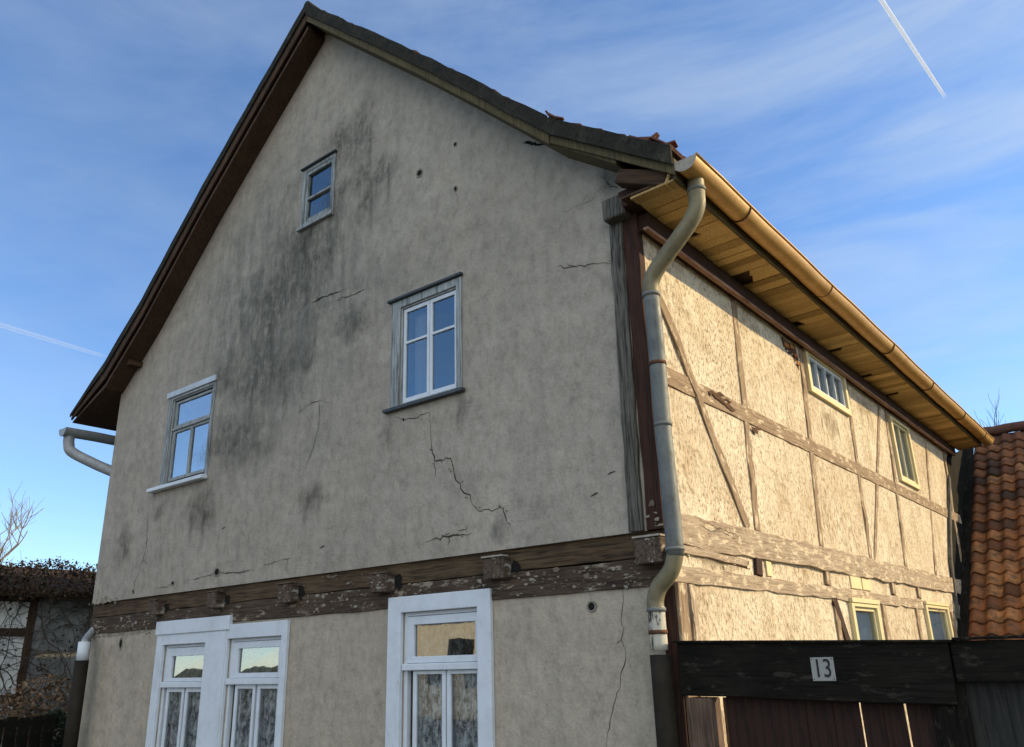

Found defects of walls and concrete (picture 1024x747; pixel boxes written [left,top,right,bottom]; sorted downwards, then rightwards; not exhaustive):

crack [312,289,365,303]
crack [399,412,513,544]
crack [134,525,289,588]
peeling [301,574,385,613]
peeling [513,561,635,596]
crack [606,597,626,747]